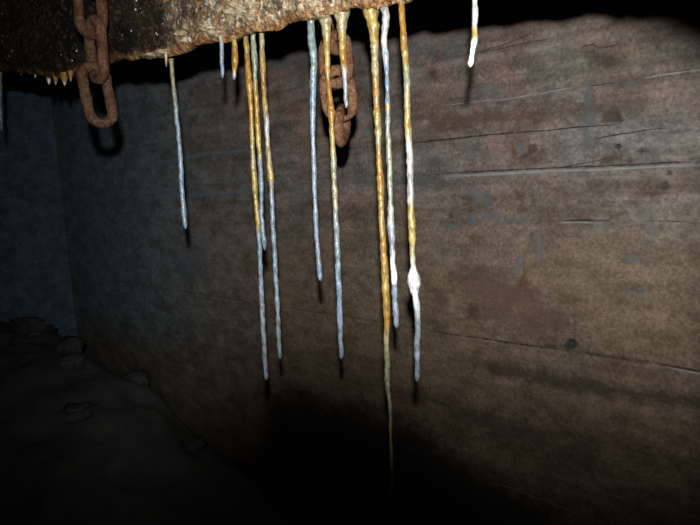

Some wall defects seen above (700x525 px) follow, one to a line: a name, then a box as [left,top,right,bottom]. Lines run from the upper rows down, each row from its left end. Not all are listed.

leakage [221,0,260,17]
efflorescence [297,0,330,20]
efflorescence [174,30,192,44]
leakage [199,21,225,38]
crack [424,125,664,142]
crack [443,159,692,177]
crack [662,364,700,374]